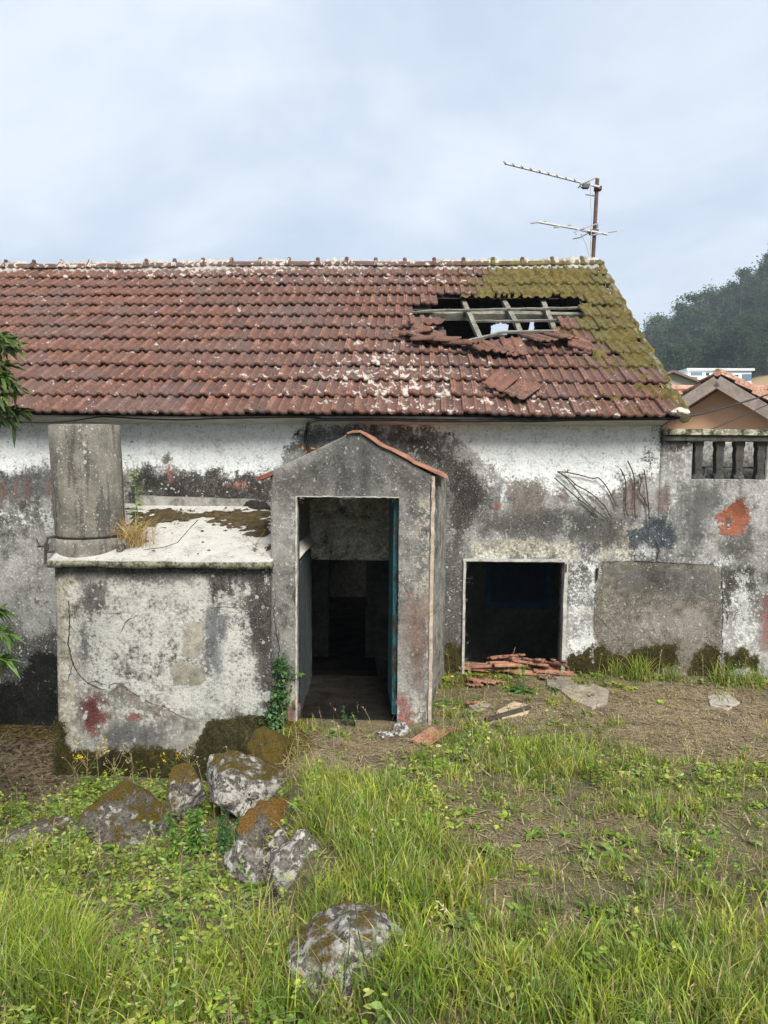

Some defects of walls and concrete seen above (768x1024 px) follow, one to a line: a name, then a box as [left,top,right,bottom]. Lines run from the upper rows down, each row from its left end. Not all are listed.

water stain [0,461,50,483]
water stain [0,650,58,726]
crack [67,601,189,720]
water stain [61,568,285,718]
water stain [124,423,720,665]
water stain [603,525,760,652]
peeling [715,495,752,539]